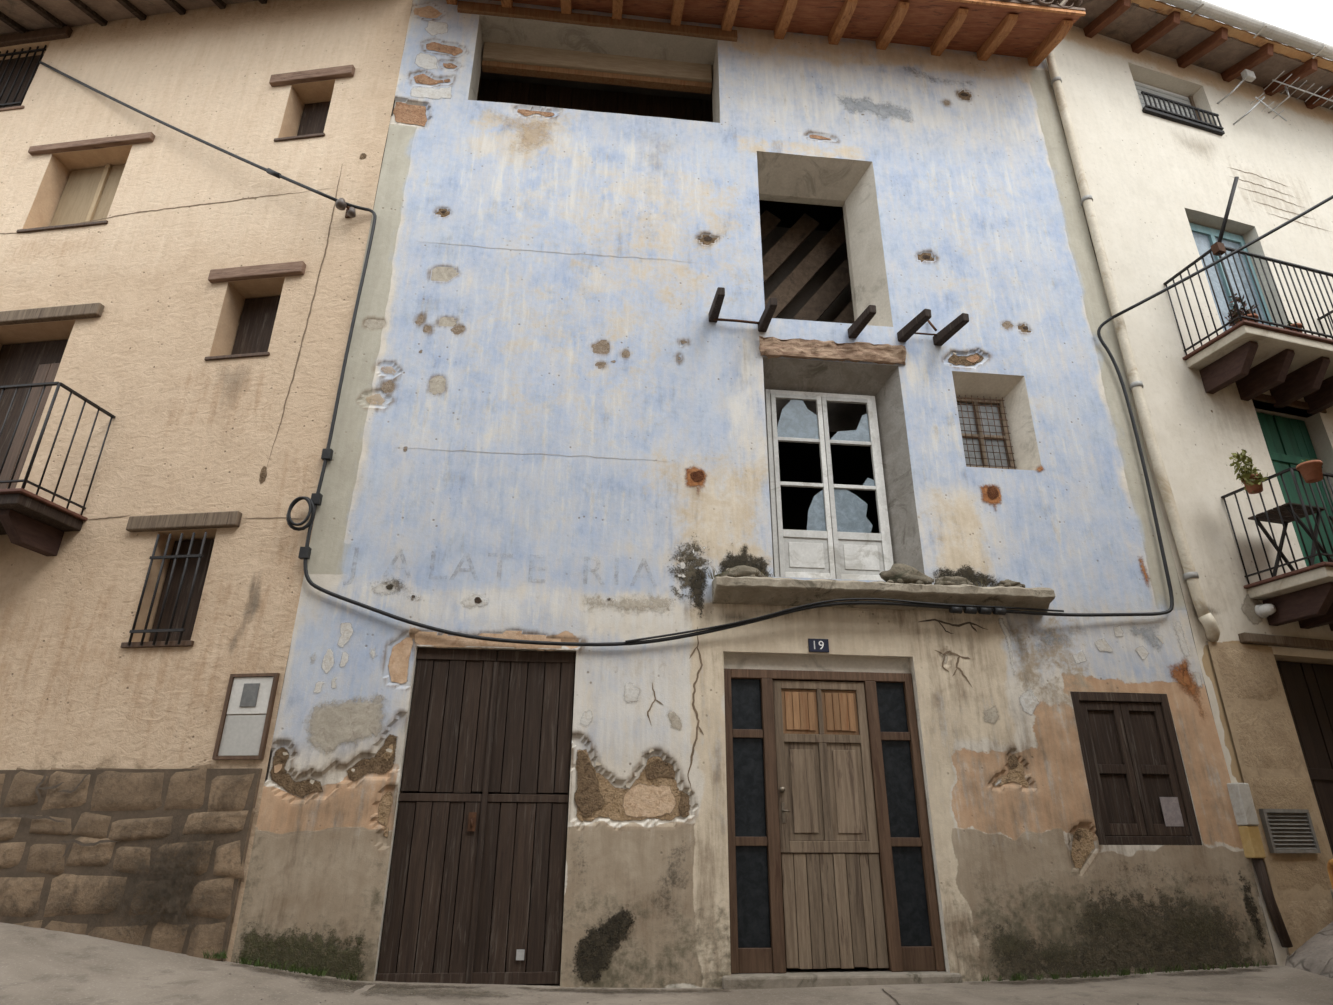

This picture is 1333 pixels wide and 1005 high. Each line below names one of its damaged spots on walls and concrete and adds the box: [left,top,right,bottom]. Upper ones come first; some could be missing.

peeling [393,6,463,126]
corrosion [685,466,706,492]
corrosion [981,484,1002,510]
peeling [309,623,398,781]
peeling [370,631,562,684]
crack [647,627,704,793]
crack [919,619,988,687]
corrosion [1170,659,1203,715]
flaking render [270,747,323,798]
flaking render [574,748,691,821]
leakage [572,904,636,984]
leakage [1223,868,1266,948]